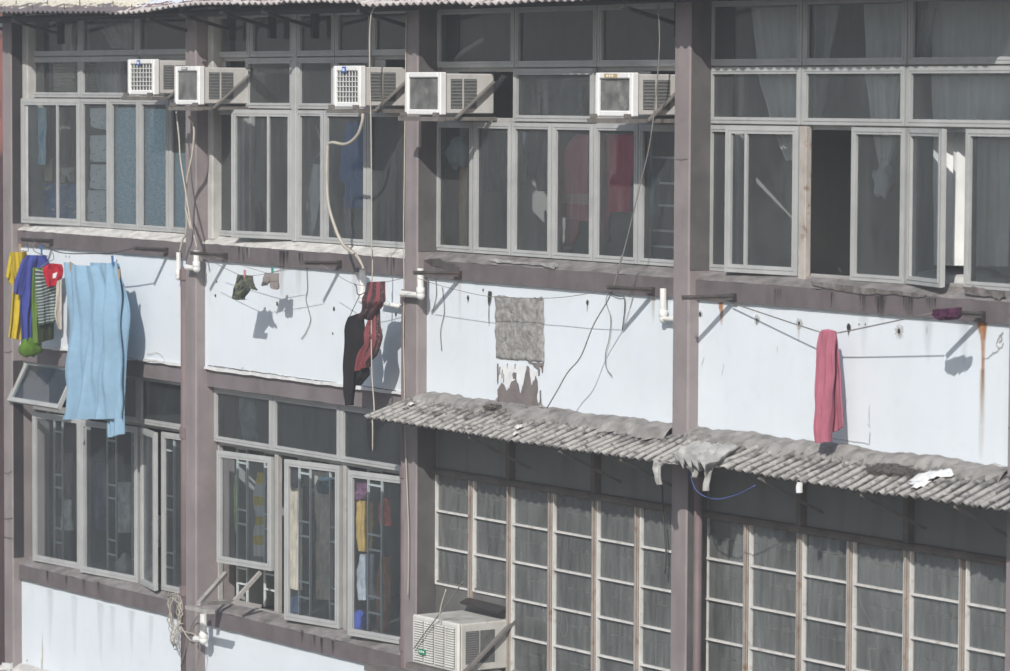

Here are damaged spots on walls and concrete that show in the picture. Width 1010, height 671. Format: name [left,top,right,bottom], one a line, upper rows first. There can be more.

rust [978,322,986,379]
peeling [495,362,544,406]